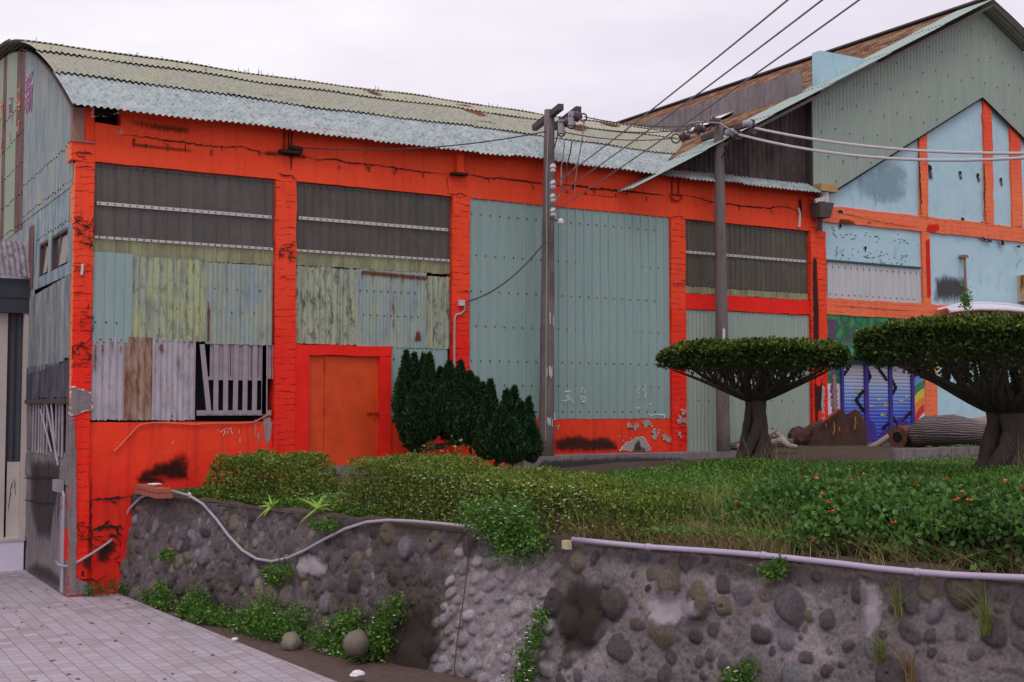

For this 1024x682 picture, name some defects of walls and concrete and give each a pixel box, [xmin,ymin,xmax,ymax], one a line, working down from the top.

crack [72,151,93,168]
crack [122,134,795,218]
damp [936,276,965,300]
spalling [68,385,93,416]
damp [556,435,617,451]
peeling [619,409,687,452]
damp [141,455,187,478]
crack [8,476,132,585]